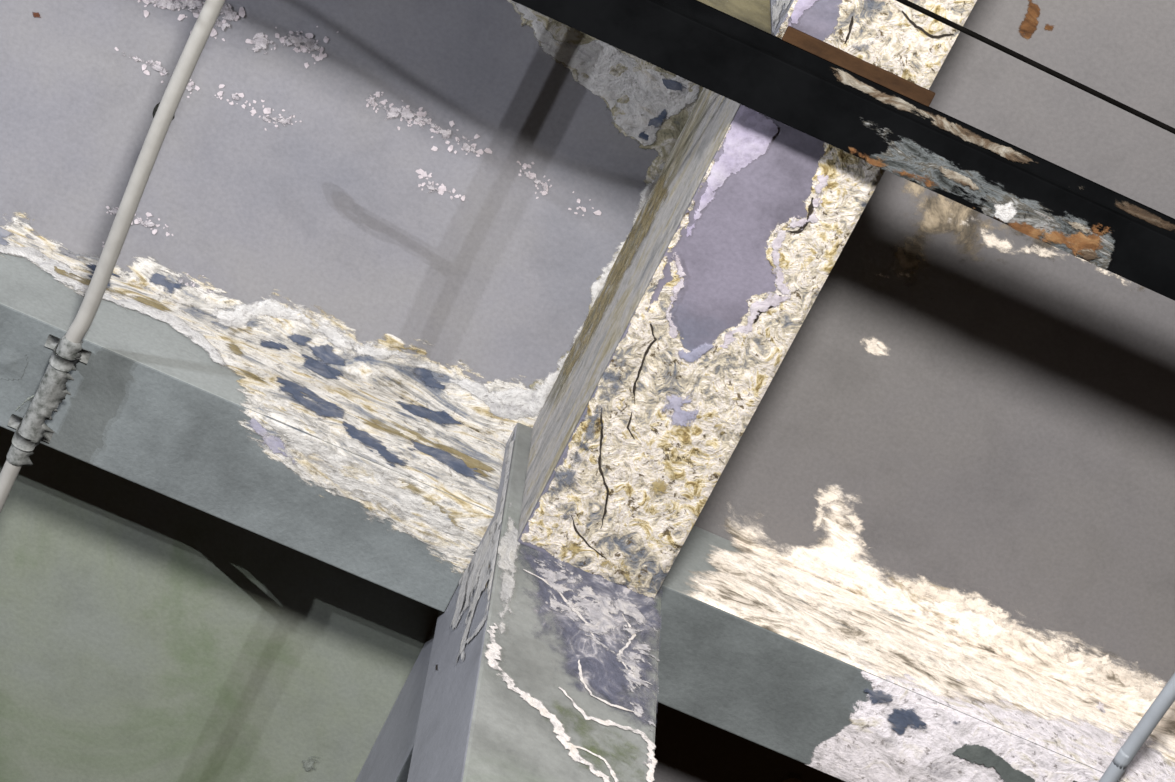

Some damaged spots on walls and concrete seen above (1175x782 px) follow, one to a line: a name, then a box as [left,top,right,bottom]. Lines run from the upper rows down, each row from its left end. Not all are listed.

peeling [776,0,817,39]
spalling [824,0,977,90]
peeling [366,92,492,157]
water stain [0,212,99,296]
corrosion [849,122,1115,270]
water stain [879,182,1124,285]
water stain [102,0,740,731]
spalling [517,105,885,598]
water stain [860,338,887,355]
water stain [687,486,1165,738]
peeling [808,659,1132,782]
peeling [1118,737,1175,782]